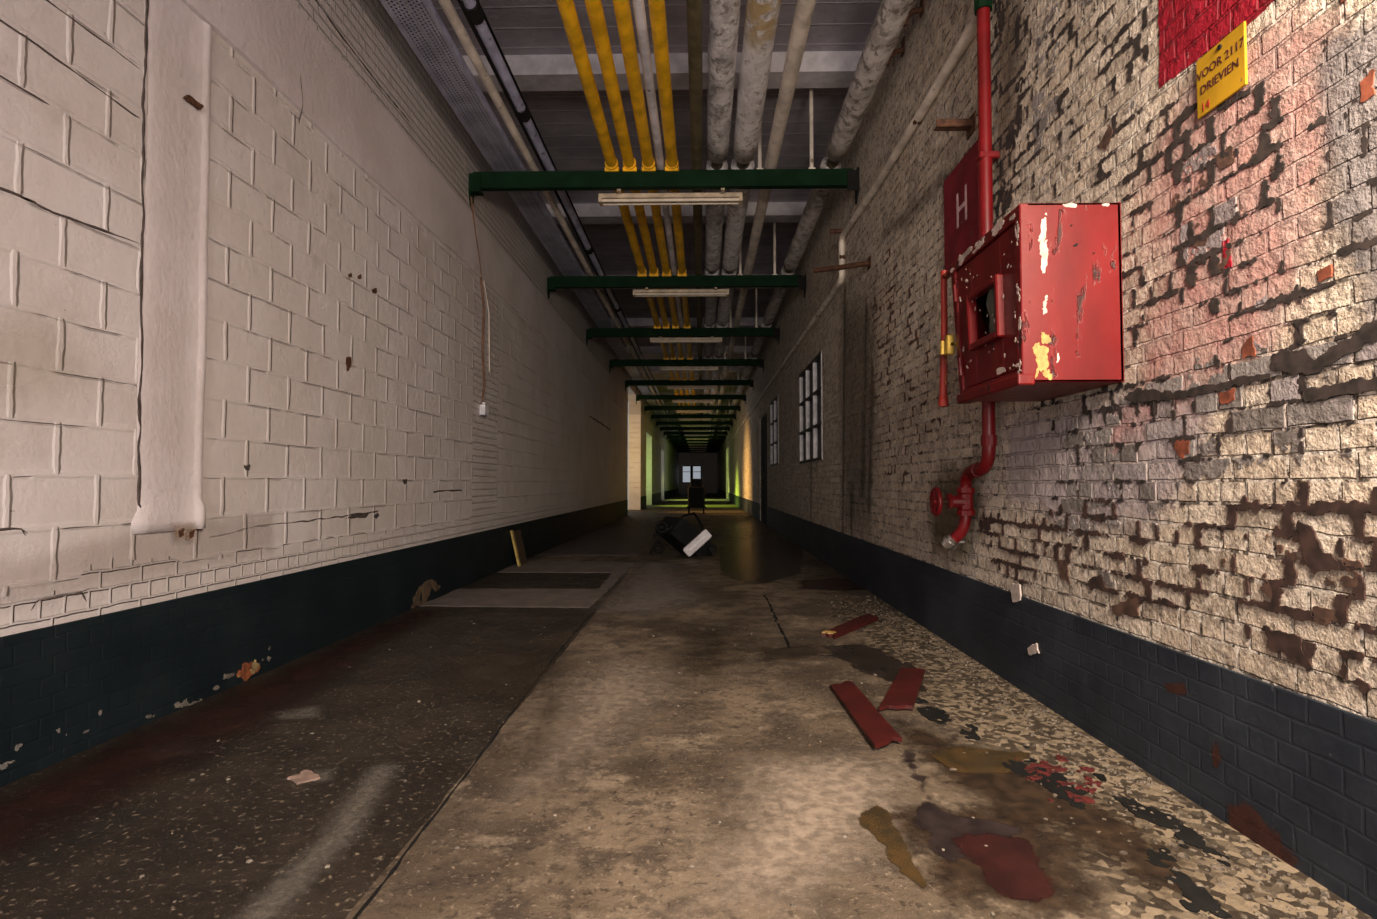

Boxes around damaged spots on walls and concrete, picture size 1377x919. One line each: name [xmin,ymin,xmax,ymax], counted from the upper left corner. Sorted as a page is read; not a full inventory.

peeling [979,0,1377,669]
peeling [174,646,271,708]
peeling [1339,650,1377,694]